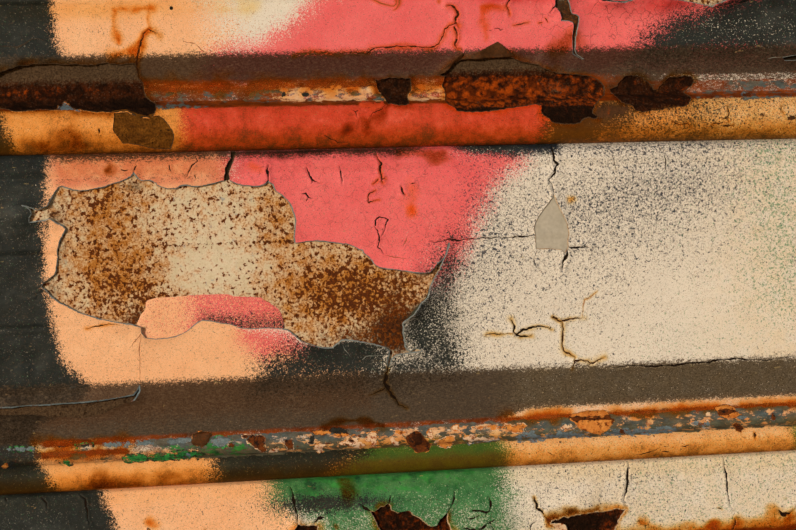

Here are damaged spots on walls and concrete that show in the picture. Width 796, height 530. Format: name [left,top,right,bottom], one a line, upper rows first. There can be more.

crack [315,5,459,55]
spalling [0,61,208,149]
spalling [436,42,701,125]
crack [548,145,559,192]
crack [368,155,427,259]
peeling [21,152,450,366]
crack [486,292,796,369]
corrosion [406,431,432,453]
corrosion [530,412,615,423]
corrosion [670,404,745,433]
corrosion [546,508,599,523]
spalling [549,507,627,530]